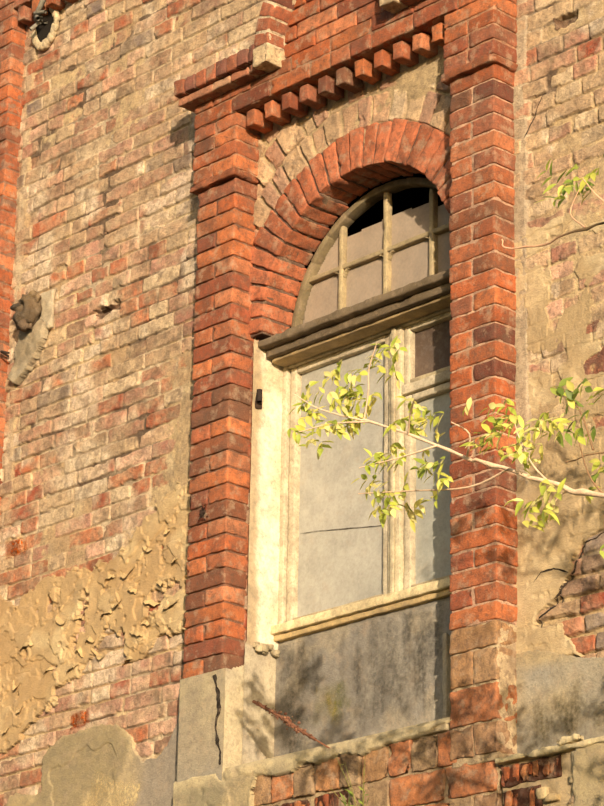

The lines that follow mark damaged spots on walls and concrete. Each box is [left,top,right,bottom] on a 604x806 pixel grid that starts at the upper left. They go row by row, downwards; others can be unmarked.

flaking render [514,209,604,657]
flaking render [0,481,209,754]
crack [212,674,221,765]